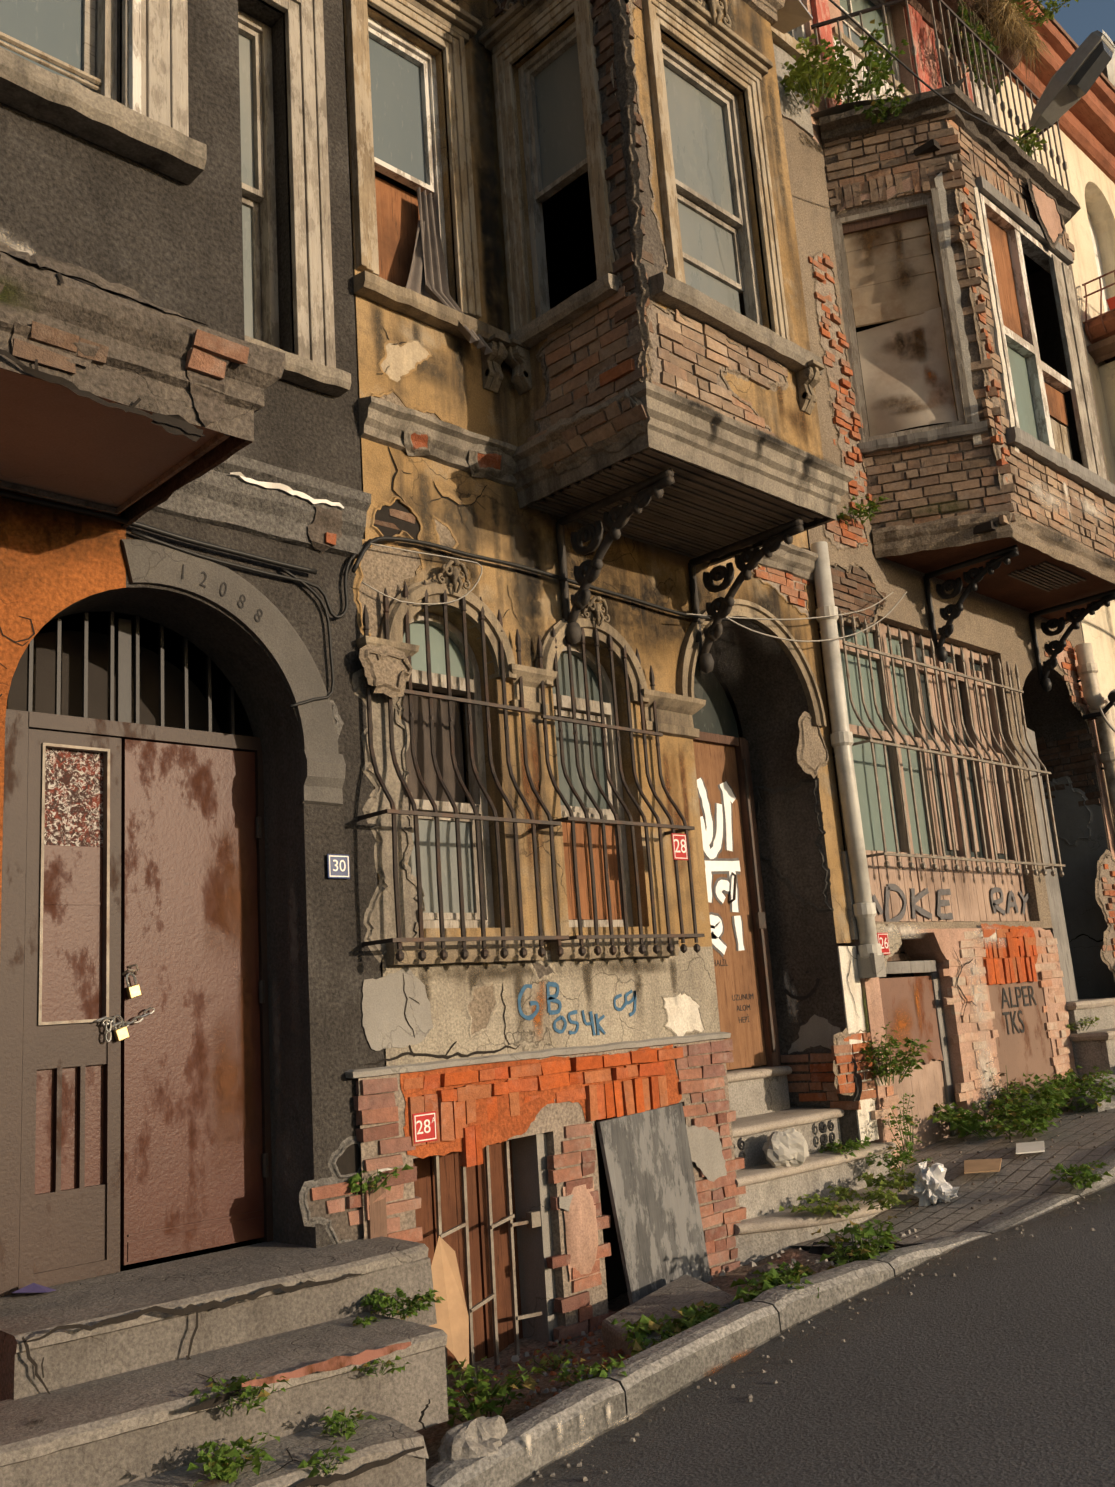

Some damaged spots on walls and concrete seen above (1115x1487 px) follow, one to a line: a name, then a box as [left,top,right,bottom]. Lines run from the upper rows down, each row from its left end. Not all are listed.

flaking render [11,321,109,374]
flaking render [151,329,249,442]
flaking render [365,335,453,456]
spalling [468,444,507,480]
flaking render [330,700,344,739]
flaking render [352,495,460,963]
flaking render [1043,776,1115,981]
spalling [400,988,707,1167]
crack [22,1273,362,1412]